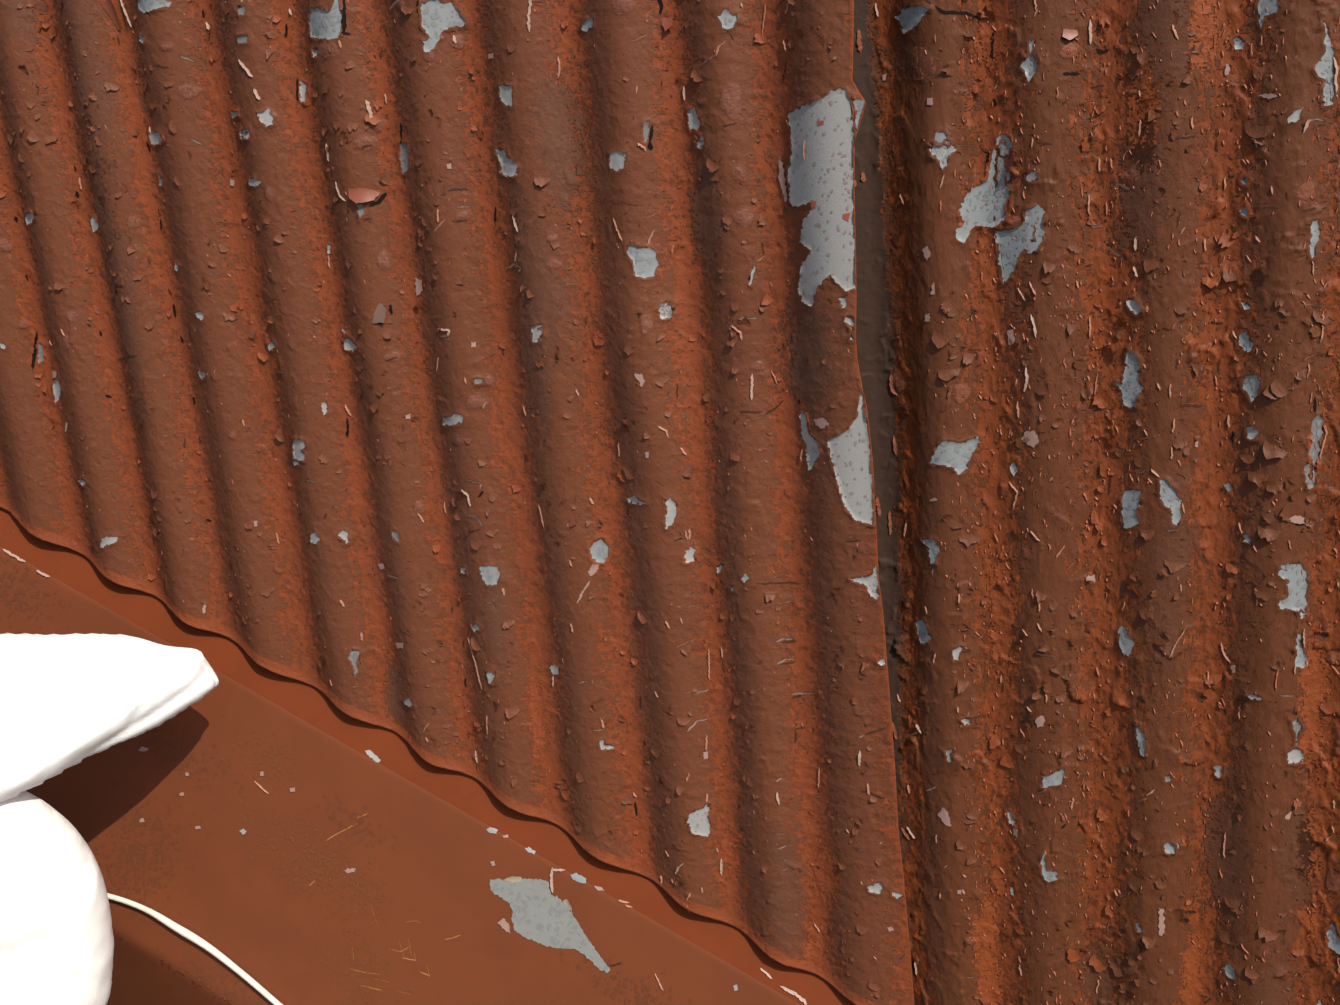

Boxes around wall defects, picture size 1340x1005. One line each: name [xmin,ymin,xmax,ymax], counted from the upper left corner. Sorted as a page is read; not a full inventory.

peeling [894,1,935,34]
corrosion [974,2,1011,86]
corrosion [1125,40,1161,152]
corrosion [1185,0,1221,81]
peeling [768,86,865,354]
peeling [790,389,875,528]
peeling [922,0,1340,1005]
corrosion [981,544,1020,697]
corrosion [1294,626,1340,969]
peeling [490,869,610,973]
peeling [861,879,904,913]
corrosion [966,854,1011,1005]